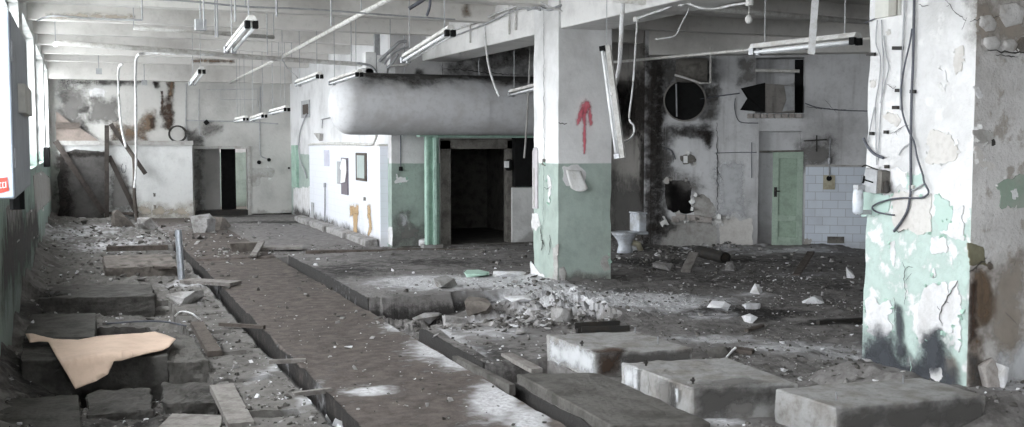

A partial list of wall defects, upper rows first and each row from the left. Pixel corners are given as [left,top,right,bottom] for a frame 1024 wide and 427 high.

flaking render [88,88,107,98]
water stain [58,82,175,141]
water stain [639,65,663,229]
flaking render [660,150,753,246]
peeling [879,165,966,266]
peeling [863,296,895,337]
water stain [841,259,1024,427]
peeling [929,368,943,382]
peeling [916,268,965,352]
crack [937,258,986,323]